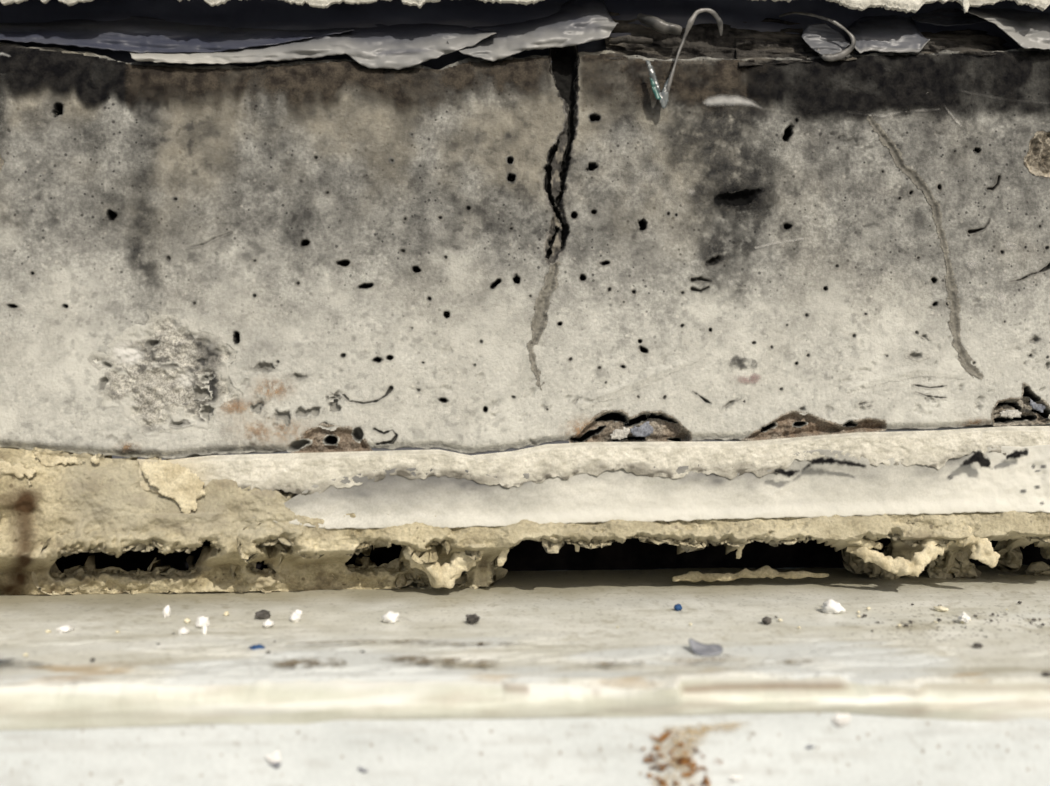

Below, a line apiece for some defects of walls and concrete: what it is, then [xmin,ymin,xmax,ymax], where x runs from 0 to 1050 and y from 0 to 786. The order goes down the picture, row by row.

leakage [0,45,550,137]
leakage [581,50,1050,260]
leakage [133,202,153,274]
crack [527,45,580,390]
spalling [87,308,373,453]
spalling [568,409,693,443]
spalling [742,398,887,441]
spalling [991,383,1050,426]
peeling [0,452,99,486]
peeling [141,458,205,514]
rust [642,726,722,786]